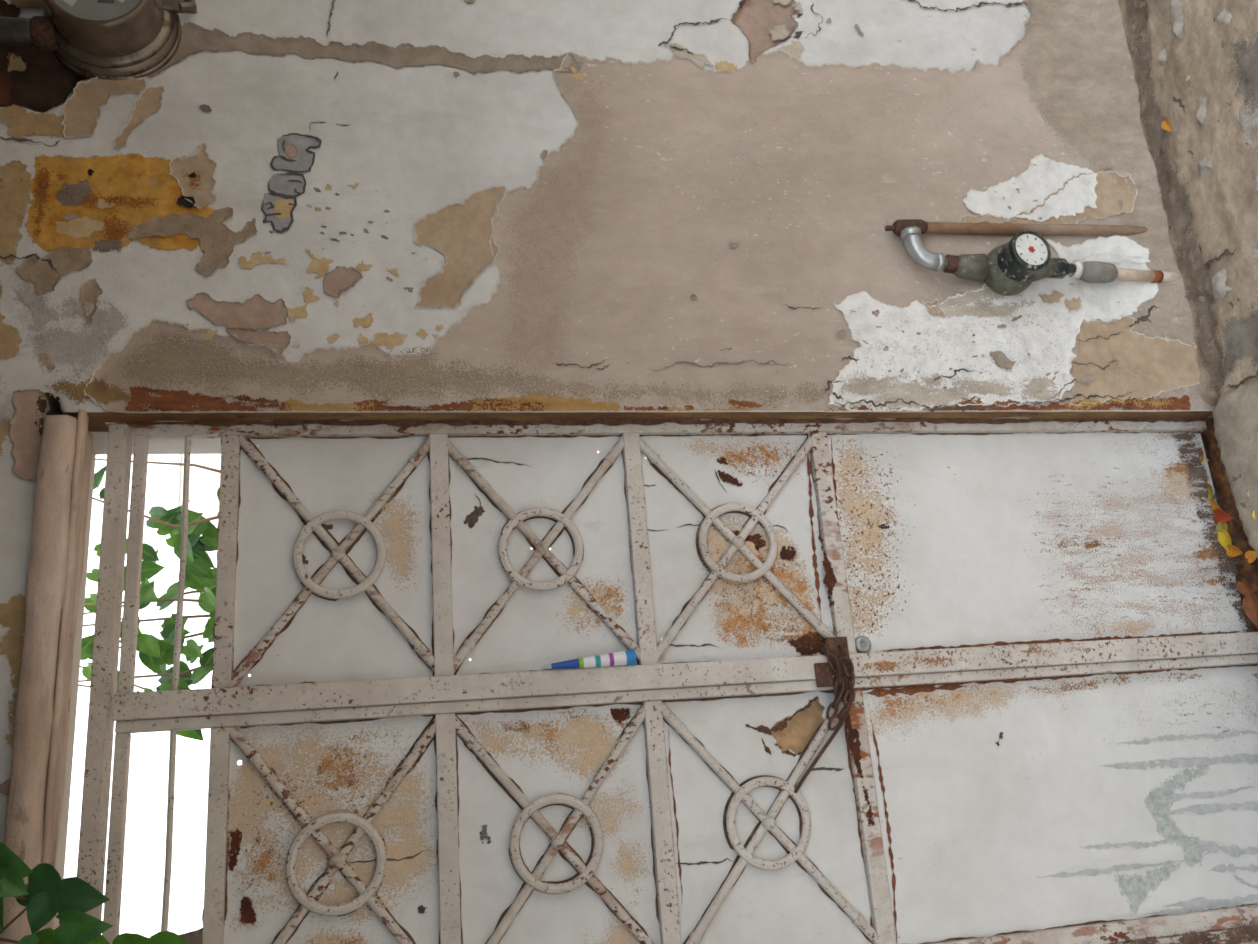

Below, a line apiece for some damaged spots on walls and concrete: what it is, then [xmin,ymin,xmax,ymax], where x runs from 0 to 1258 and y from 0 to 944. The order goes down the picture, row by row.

crack [327,0,335,38]
crack [908,0,1028,12]
peeling [84,0,1214,413]
flaking render [15,246,103,324]
corrosion [43,375,776,412]
corrosion [929,395,1191,411]
corrosion [683,432,1258,940]
corrosion [224,720,438,944]
corrosion [668,730,683,894]